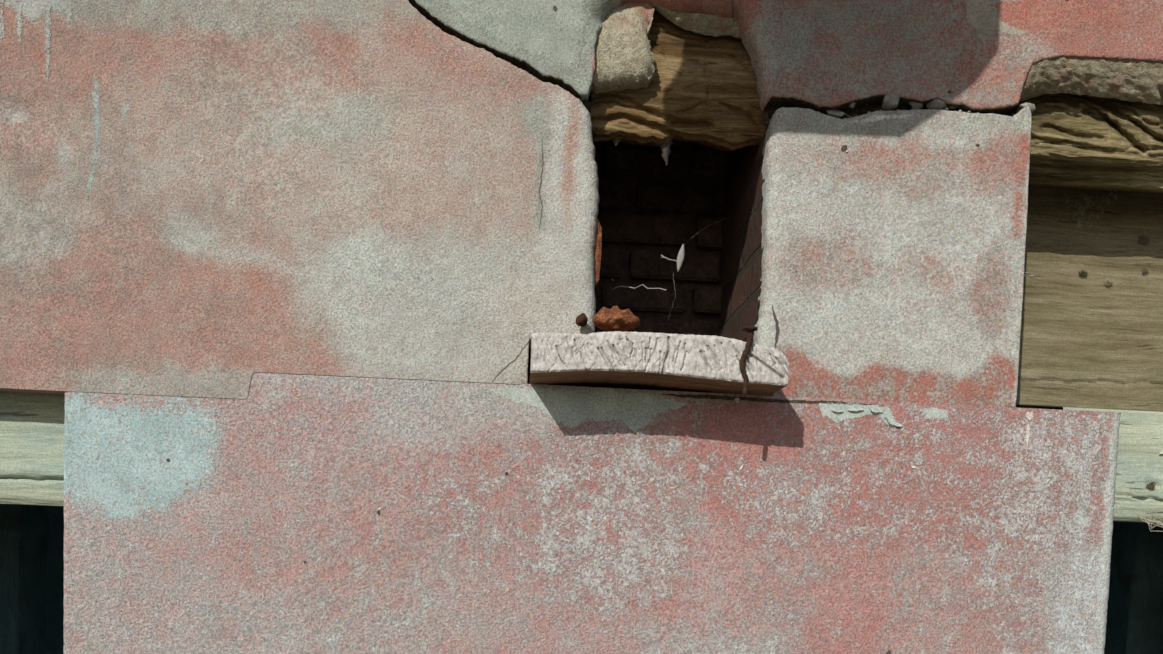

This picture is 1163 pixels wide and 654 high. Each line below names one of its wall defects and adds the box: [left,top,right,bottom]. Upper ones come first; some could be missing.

crack [408,0,458,38]
flaking render [952,0,1027,36]
flaking render [591,2,742,94]
crack [494,55,591,110]
peeling [818,402,902,427]
peeling [487,385,691,595]